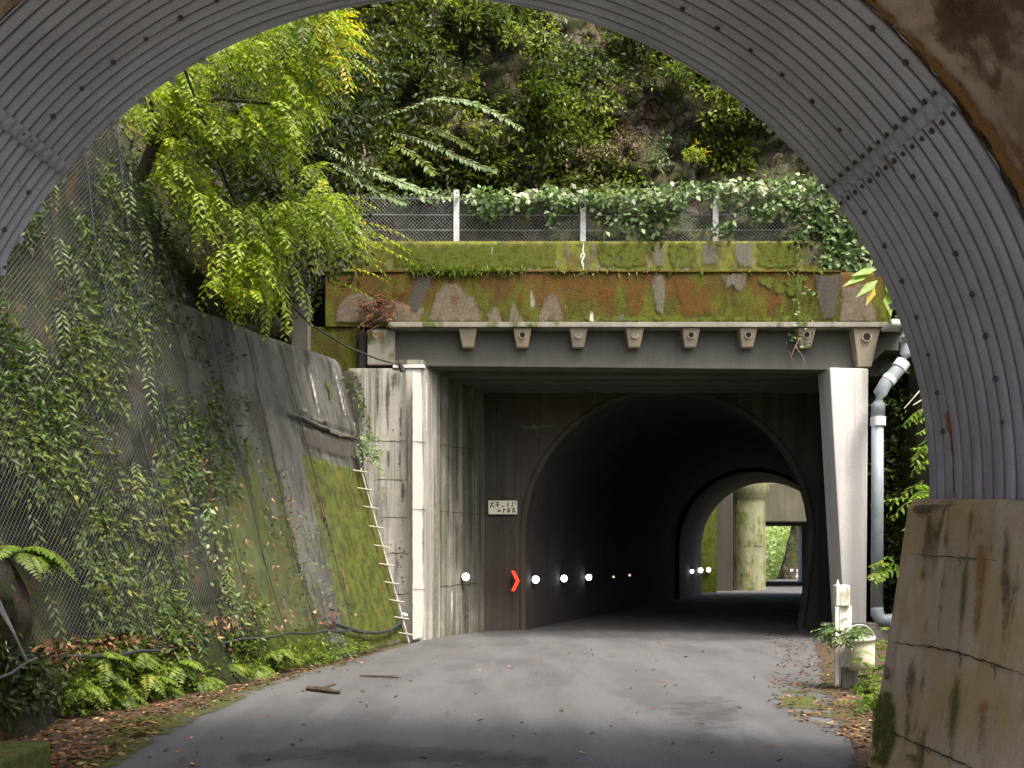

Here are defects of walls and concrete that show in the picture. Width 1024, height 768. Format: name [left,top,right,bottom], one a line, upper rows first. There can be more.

rust [866,0,1024,209]
damp [408,277,431,312]
damp [652,274,665,313]
damp [440,389,481,569]
damp [377,372,428,639]
crack [910,553,998,566]
crack [893,642,1024,677]